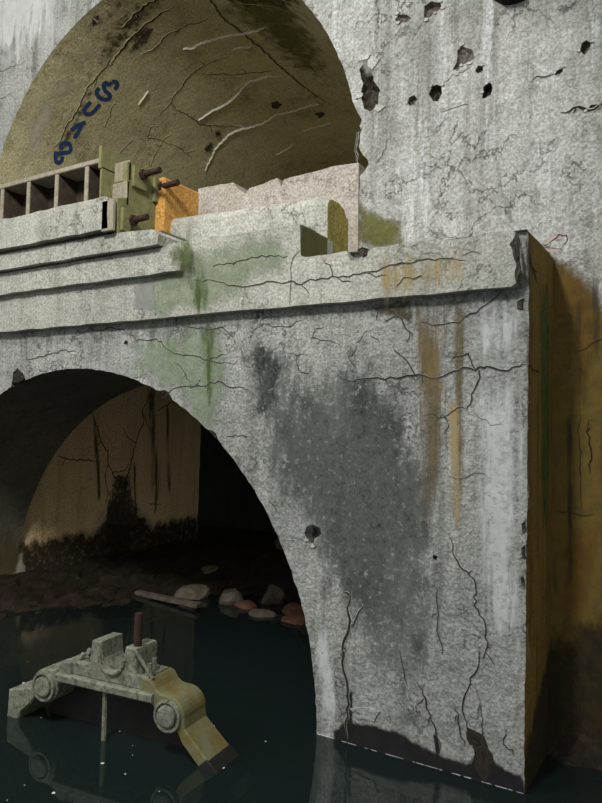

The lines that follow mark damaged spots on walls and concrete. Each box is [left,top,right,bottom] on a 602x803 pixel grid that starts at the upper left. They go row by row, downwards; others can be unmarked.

water stain [0,0,60,64]
crack [52,0,332,171]
spalling [355,53,386,112]
spalling [429,83,444,101]
spalling [453,41,484,76]
spalling [480,81,496,98]
crack [200,251,540,434]
water stain [255,326,440,664]
water stain [334,234,602,794]
water stain [318,634,335,720]
crack [340,586,365,740]
crack [448,532,516,783]